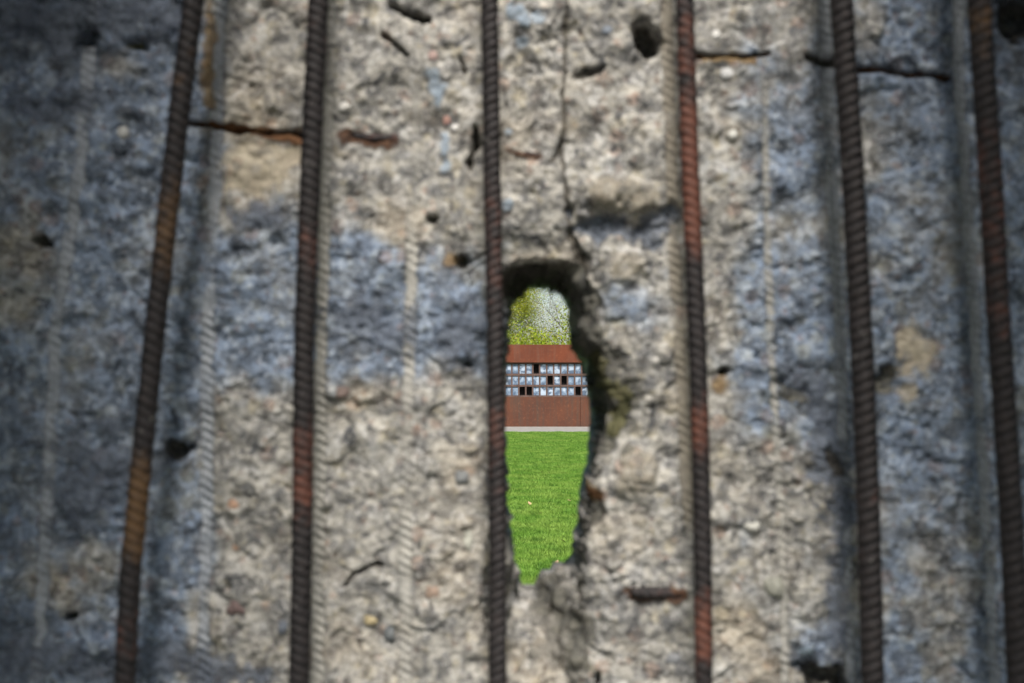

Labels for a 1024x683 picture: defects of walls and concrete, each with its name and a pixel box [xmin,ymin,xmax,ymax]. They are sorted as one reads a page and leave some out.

rust [337,128,399,150]
crack [546,0,589,277]
spalling [114,0,205,683]
spalling [566,0,727,683]
rust [623,584,688,604]